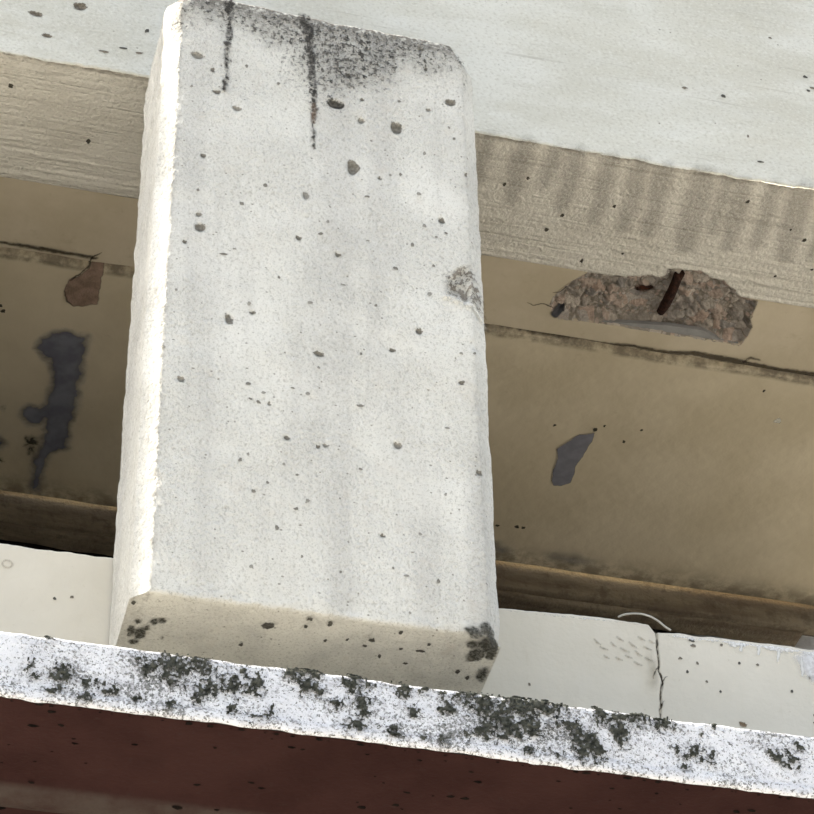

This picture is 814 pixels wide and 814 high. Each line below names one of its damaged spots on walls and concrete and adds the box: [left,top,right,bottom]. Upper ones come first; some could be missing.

water stain [222,0,235,92]
water stain [299,14,317,149]
spalling [531,269,758,346]
peeling [552,425,606,486]
crack [653,629,666,717]